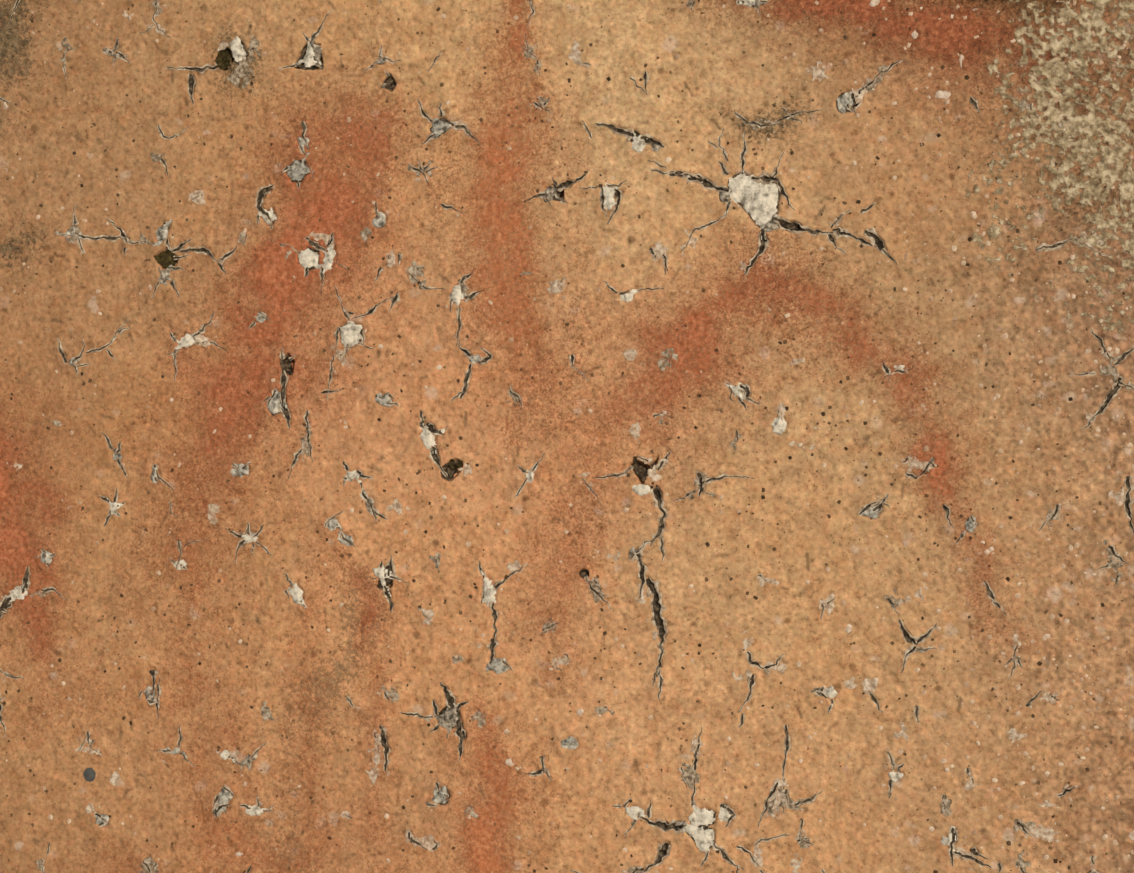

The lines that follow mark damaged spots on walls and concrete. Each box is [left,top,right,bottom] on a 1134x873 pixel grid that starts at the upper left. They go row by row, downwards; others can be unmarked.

damp [709,0,1134,332]
crack [263,345,313,479]
crack [419,410,448,477]
crack [514,453,545,499]
damp [552,252,1012,643]
crack [1075,327,1134,430]
crack [579,451,755,700]
crack [622,843,672,873]
crack [736,818,827,873]